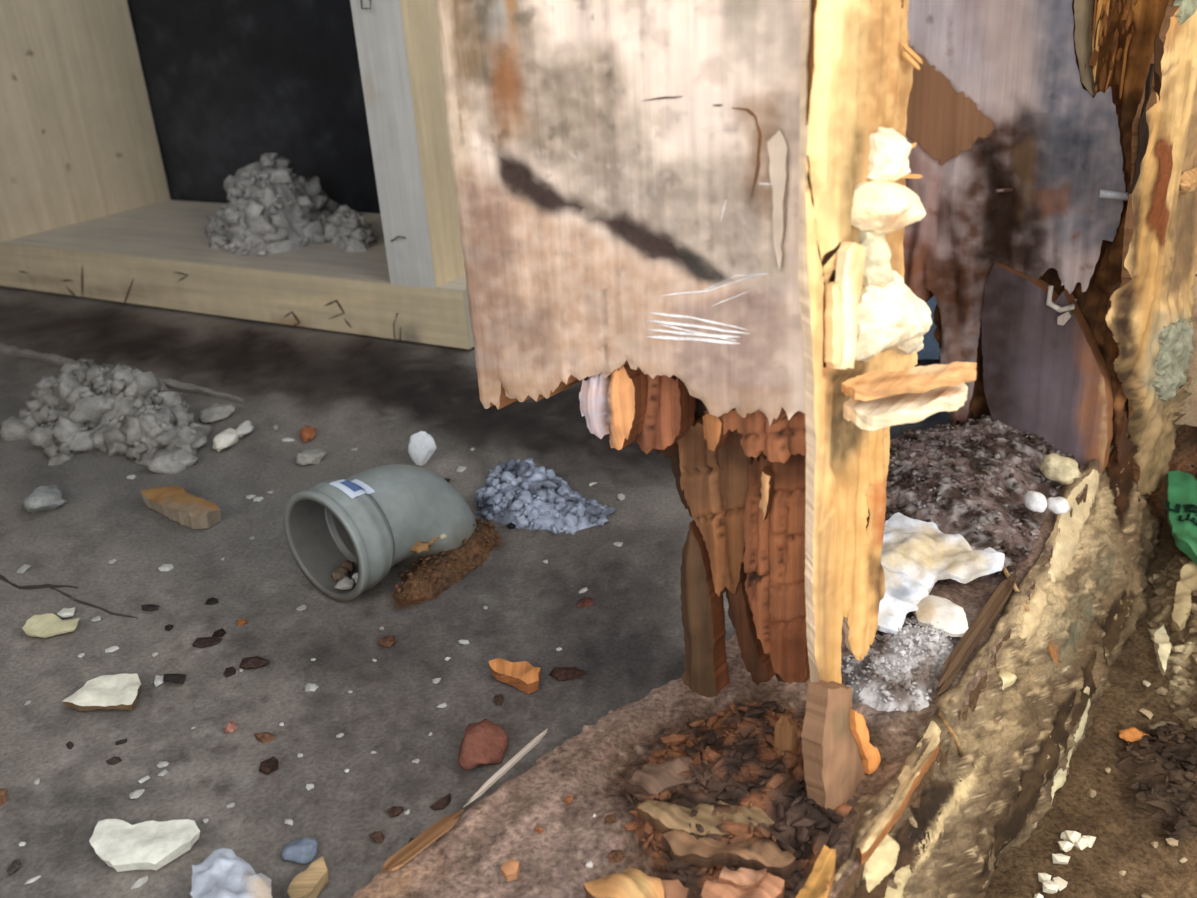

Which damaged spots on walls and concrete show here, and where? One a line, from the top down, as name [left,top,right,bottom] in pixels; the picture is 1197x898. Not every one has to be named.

crack [806,0,817,125]
crack [712,104,762,199]
damp [906,44,1018,263]
damp [499,157,726,282]
crack [807,155,841,284]
crack [0,575,138,619]